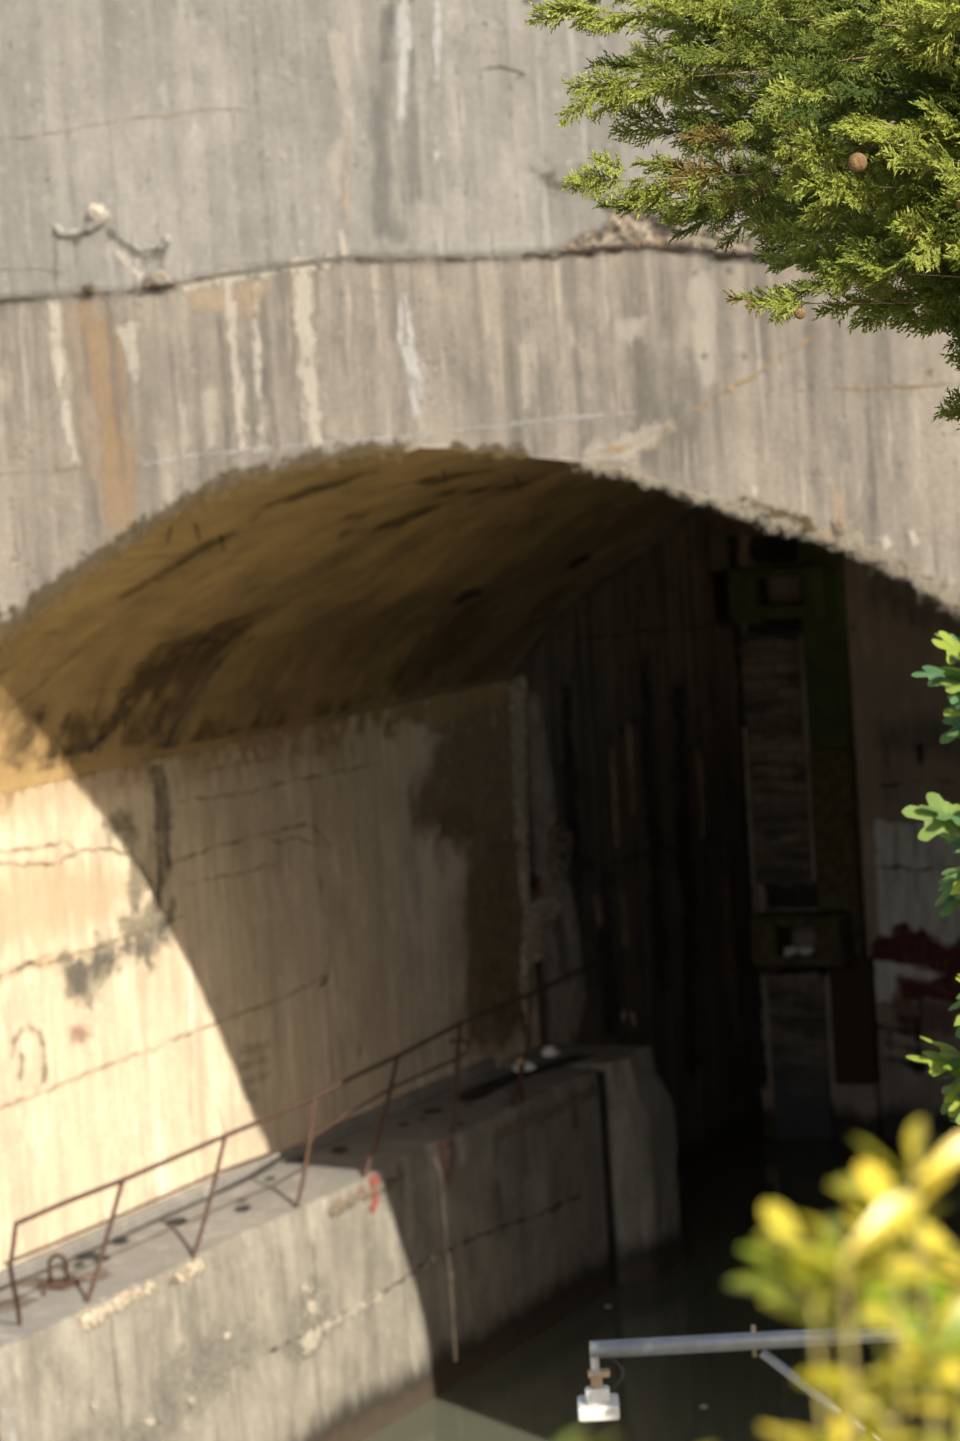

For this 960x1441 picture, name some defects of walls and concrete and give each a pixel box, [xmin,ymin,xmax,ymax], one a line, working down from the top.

leakage [397,0,412,119]
leakage [432,0,443,70]
spalling [541,171,777,256]
spalling [116,249,172,290]
rust [65,296,136,538]
crack [0,841,136,868]
crack [0,916,184,978]
crack [174,822,331,990]
leakage [409,695,533,1047]
crack [267,1191,582,1353]
leakage [447,1253,457,1362]